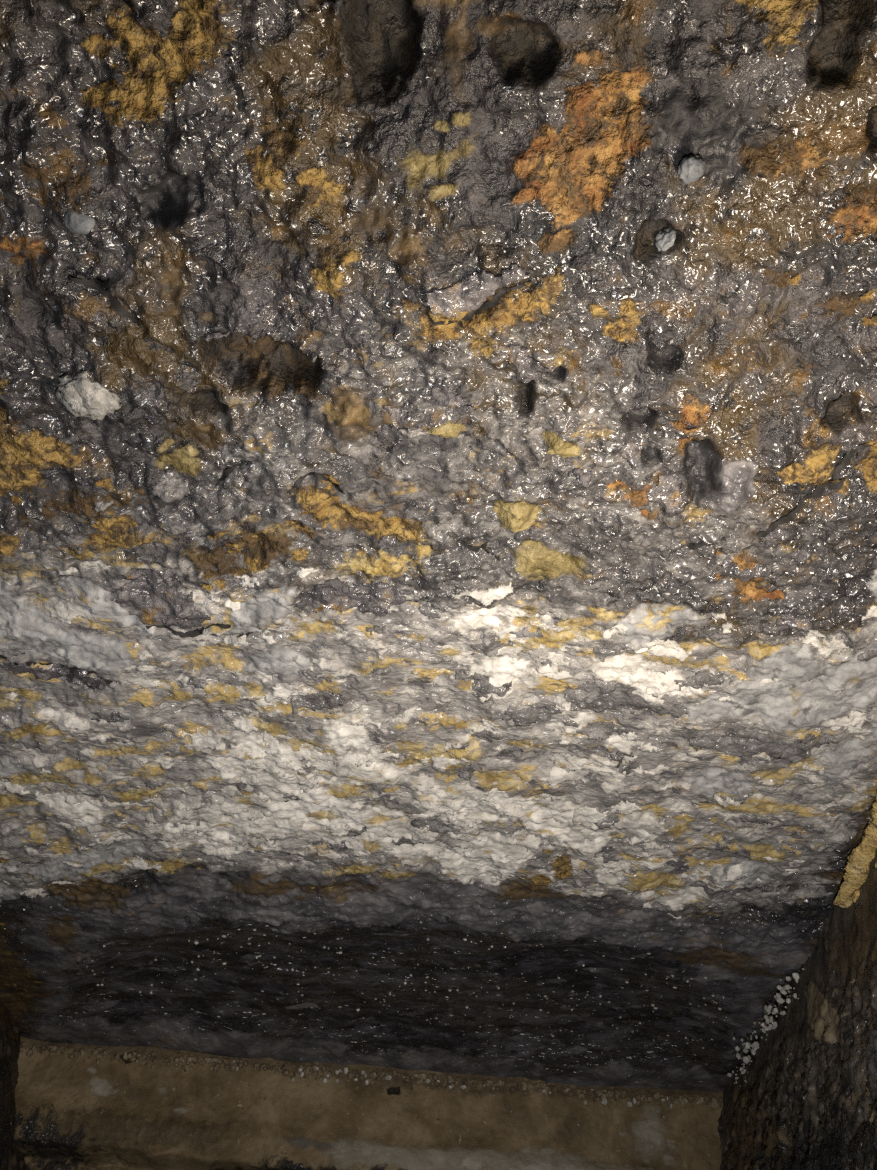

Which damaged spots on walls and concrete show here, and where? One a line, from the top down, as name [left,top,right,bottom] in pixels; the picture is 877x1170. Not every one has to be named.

rust [79,0,240,128]
rust [725,0,818,57]
rust [402,49,657,358]
peeling [425,263,530,319]
rust [0,408,156,560]
peeling [93,499,114,512]
peeling [150,470,189,503]
peeling [389,426,428,445]
rust [776,423,877,494]
damp [0,290,877,988]
damp [214,1017,877,1170]